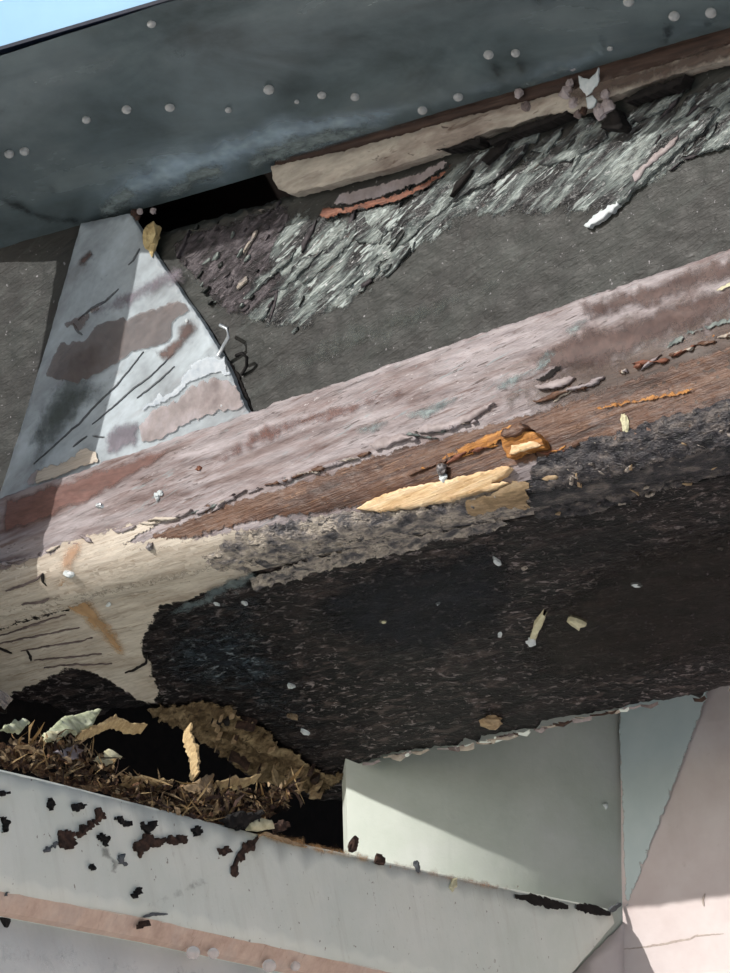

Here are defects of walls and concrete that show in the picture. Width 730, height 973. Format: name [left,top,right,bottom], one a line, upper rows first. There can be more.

peeling [128,67,730,334]
peeling [46,301,188,383]
peeling [139,356,243,442]
peeling [202,398,730,592]
damp [175,574,255,613]
damp [172,613,283,691]
damp [328,549,507,649]
damp [531,534,730,683]
spalling [0,698,69,745]
spalling [60,704,280,796]
spalling [240,763,344,852]
crack [624,933,724,950]